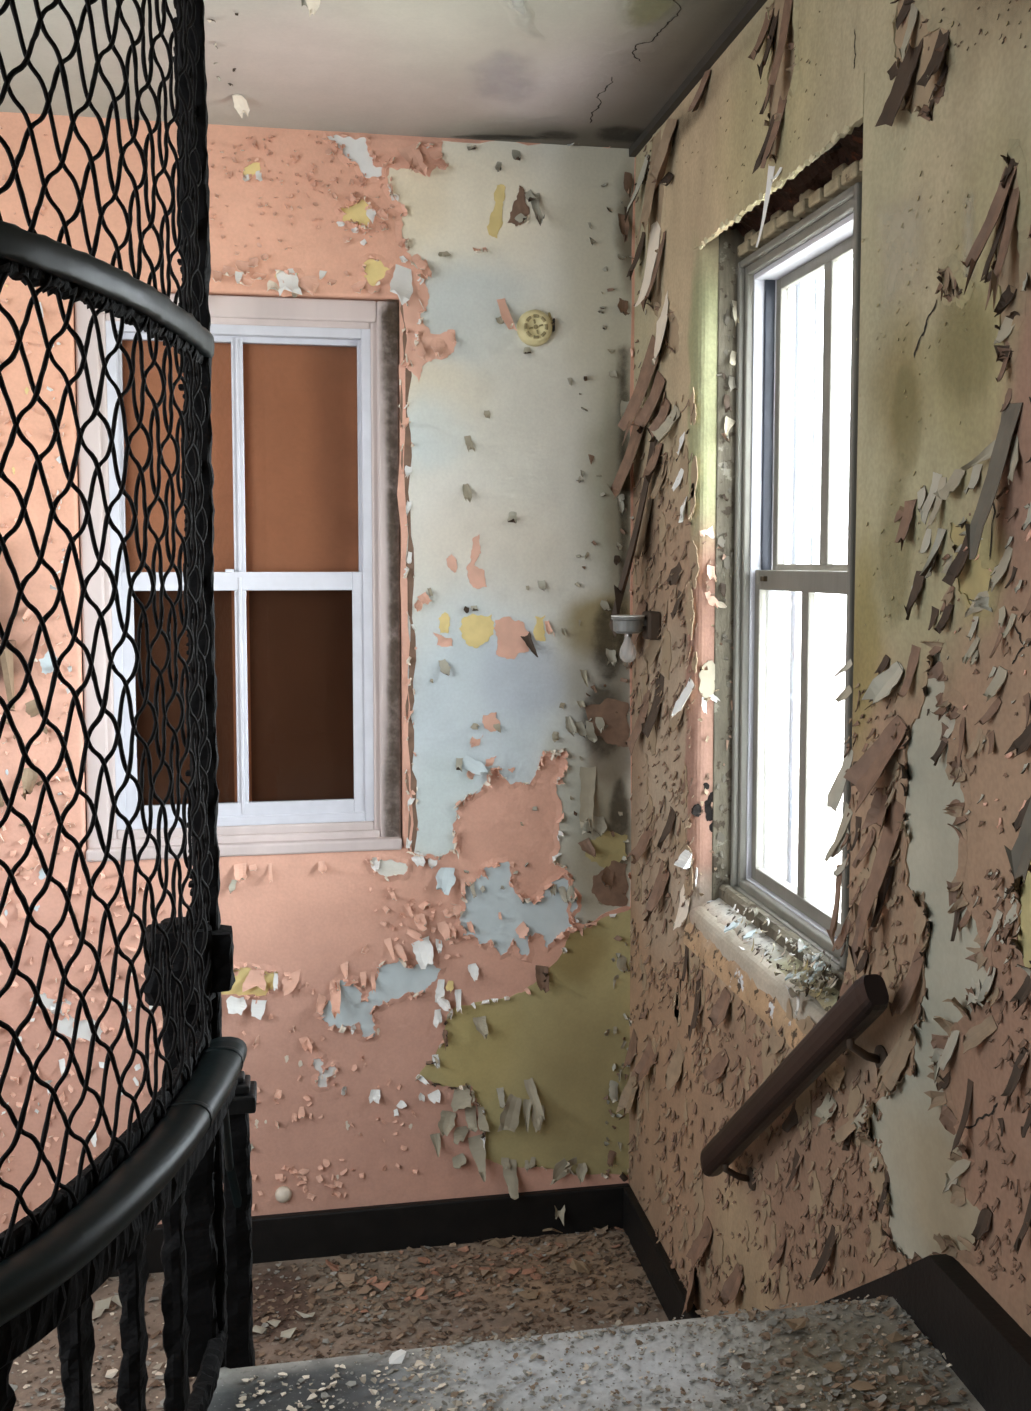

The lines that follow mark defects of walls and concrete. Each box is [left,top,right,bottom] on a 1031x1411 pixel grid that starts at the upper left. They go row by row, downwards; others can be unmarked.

peeling [301,0,320,16]
peeling [214,43,250,118]
crack [590,0,682,123]
flaking render [694,0,1031,258]
peeling [3,287,61,361]
crack [914,300,937,357]
peeling [0,377,65,497]
crack [988,502,996,557]
crack [1012,625,1025,664]
peeling [208,70,1031,1331]
peeling [0,608,163,1166]
crack [965,1103,997,1129]